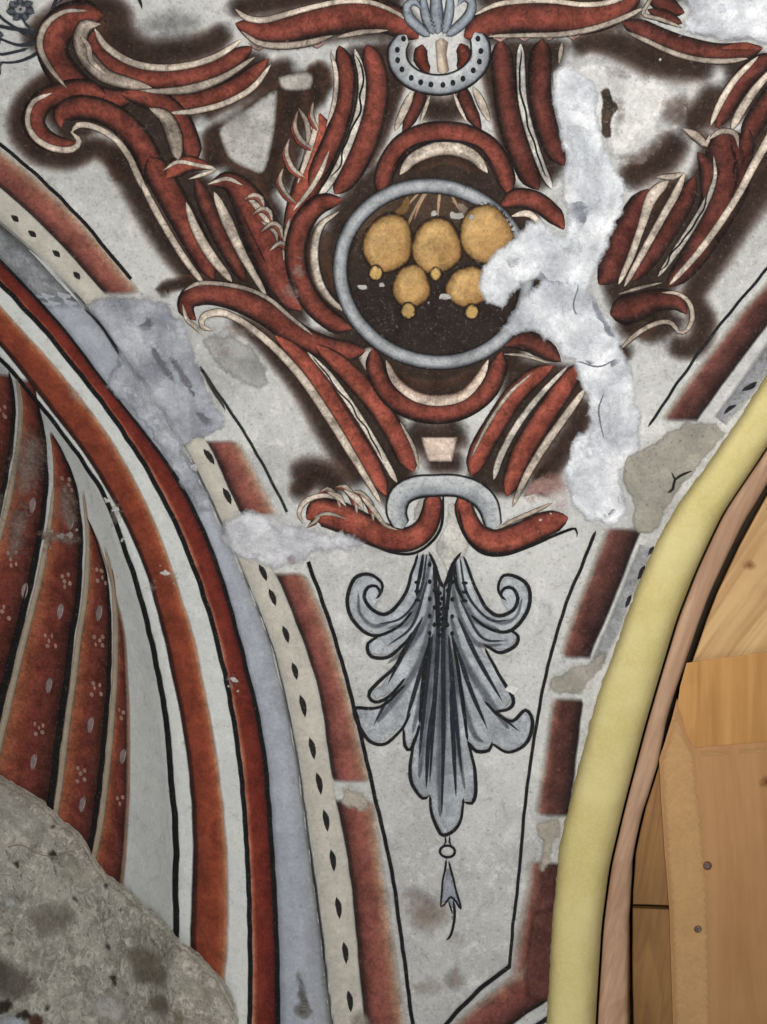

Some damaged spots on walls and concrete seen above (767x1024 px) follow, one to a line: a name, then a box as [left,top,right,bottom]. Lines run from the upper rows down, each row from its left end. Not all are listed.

spalling [0,775,239,1024]